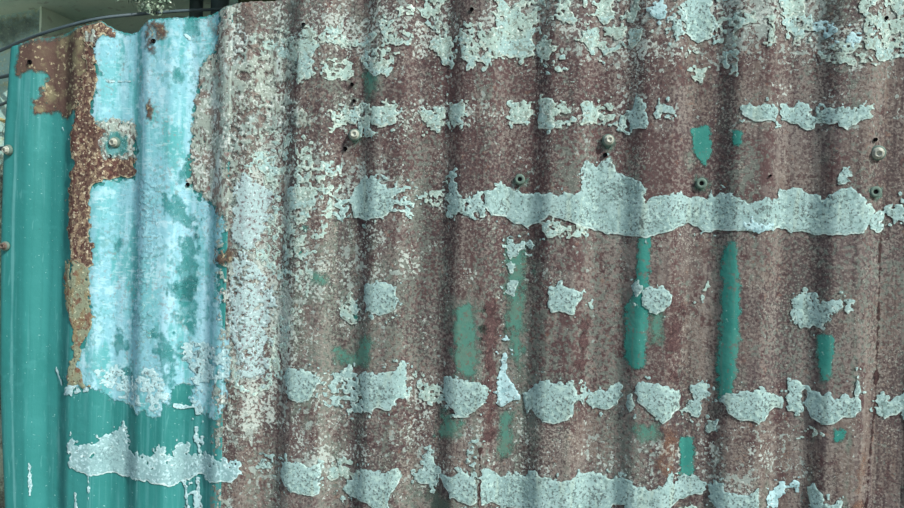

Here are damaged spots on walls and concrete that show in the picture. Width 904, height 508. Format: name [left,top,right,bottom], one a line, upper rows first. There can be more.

corrosion [15,25,96,119]
peeling [575,0,904,77]
peeling [503,94,677,135]
peeling [414,153,904,243]
corrosion [215,249,233,265]
peeling [64,0,568,508]
corrosion [478,285,507,505]
corrosion [572,314,591,394]
peeling [412,353,866,426]
corrosion [664,302,686,357]
corrosion [865,233,883,508]
peeling [255,439,844,508]